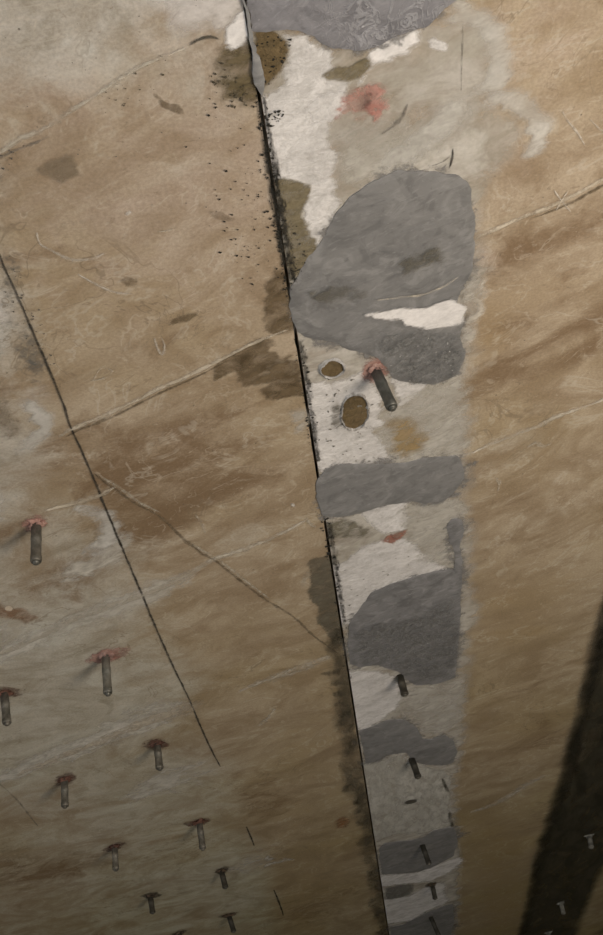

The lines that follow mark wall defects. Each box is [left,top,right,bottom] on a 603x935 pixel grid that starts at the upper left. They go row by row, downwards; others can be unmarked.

leakage [205,36,320,461]
crack [0,255,337,766]
leakage [308,518,358,755]
leakage [343,763,373,848]
leakage [369,859,388,935]
leakage [520,625,603,935]